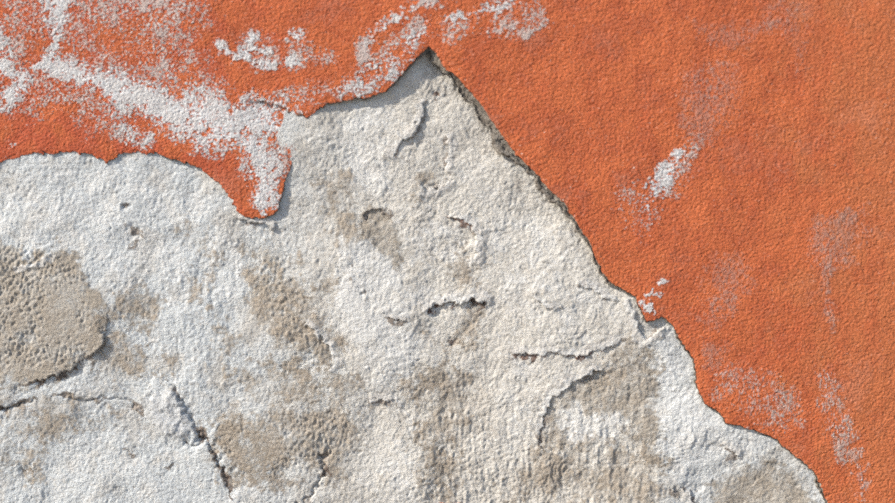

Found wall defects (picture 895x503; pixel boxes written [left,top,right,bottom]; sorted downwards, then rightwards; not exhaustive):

peeling [354,15,427,83]
peeling [198,55,229,86]
peeling [18,81,60,121]
peeling [277,84,320,102]
peeling [108,119,155,151]
damp [676,143,701,176]
damp [311,163,361,247]
crack [0,391,108,414]
crack [131,400,144,417]
damp [505,436,663,503]